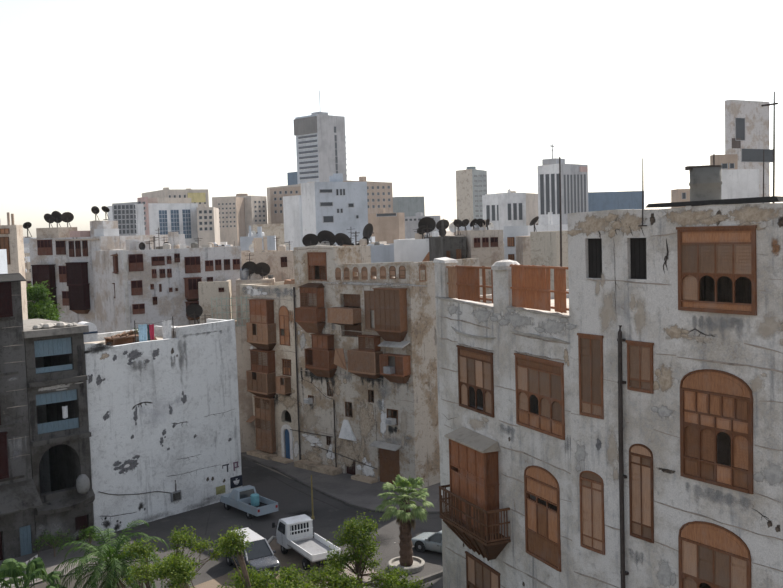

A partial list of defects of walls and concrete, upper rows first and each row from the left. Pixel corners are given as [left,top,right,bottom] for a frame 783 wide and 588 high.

flaking render [568,204,783,238]
spalling [661,325,689,339]
spalling [84,342,159,365]
spalling [113,455,140,474]